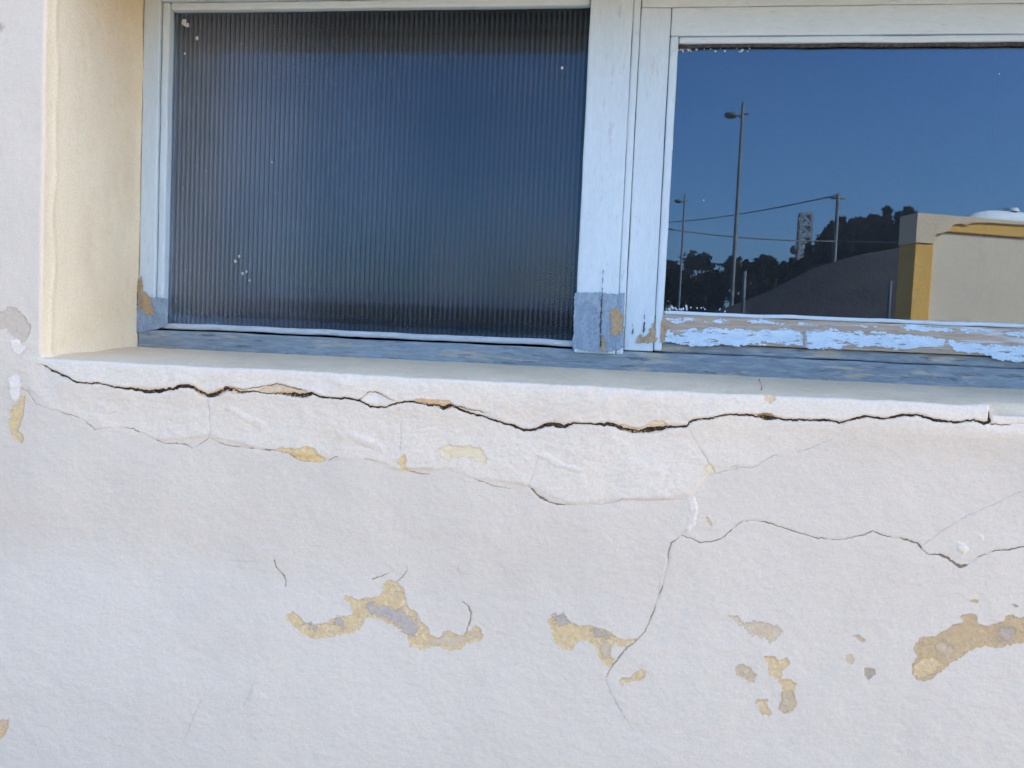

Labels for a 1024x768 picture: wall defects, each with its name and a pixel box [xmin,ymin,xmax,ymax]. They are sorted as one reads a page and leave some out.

peeling [599,308,624,352]
peeling [7,374,25,443]
peeling [277,445,325,463]
peeling [438,445,488,464]
crack [23,366,1010,506]
crack [217,560,286,586]
peeling [286,580,483,651]
peeling [548,612,637,667]
peeling [728,614,797,717]
crack [605,491,1024,728]
peeling [912,600,1024,682]